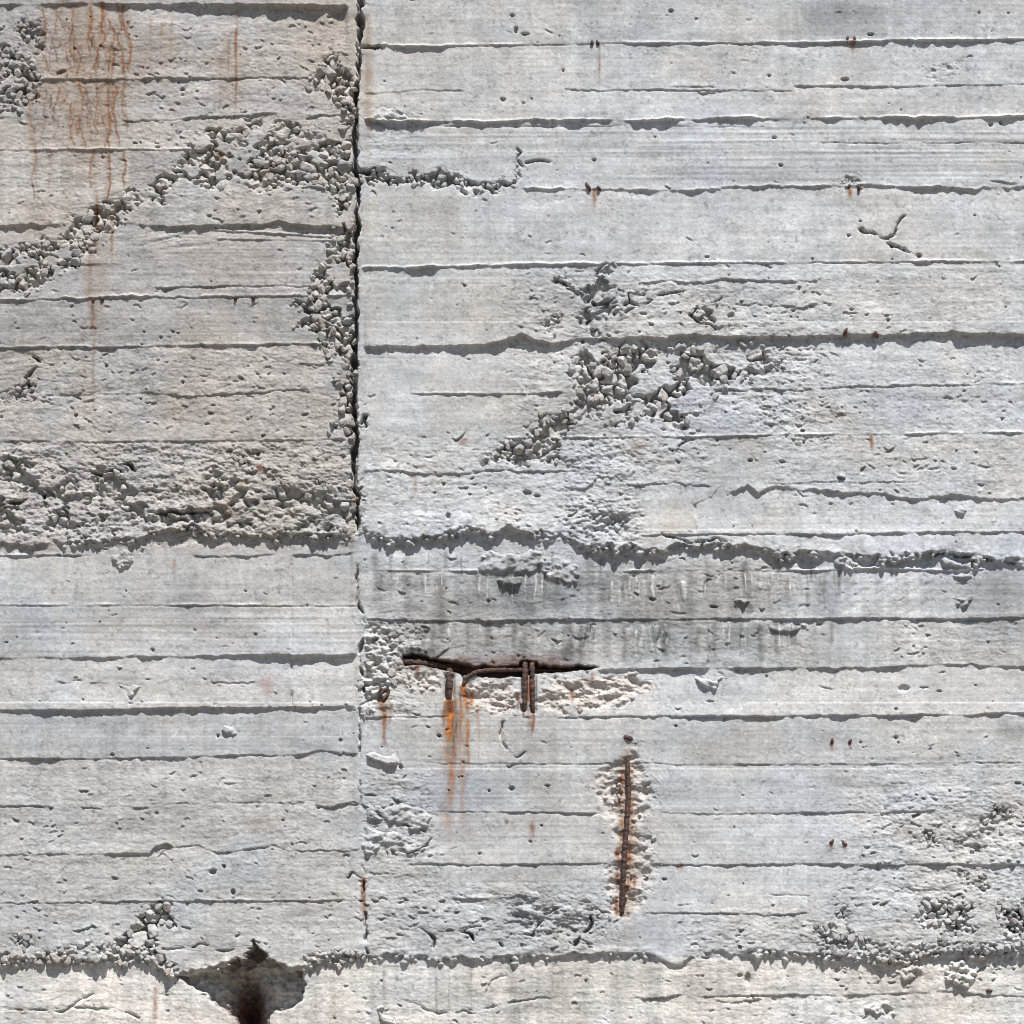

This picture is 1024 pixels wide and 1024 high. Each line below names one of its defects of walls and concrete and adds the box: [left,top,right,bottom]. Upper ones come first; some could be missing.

rust [46,2,132,162]
crack [858,214,921,259]
rust [443,686,473,750]
spalling [358,619,658,721]
spalling [499,740,664,951]